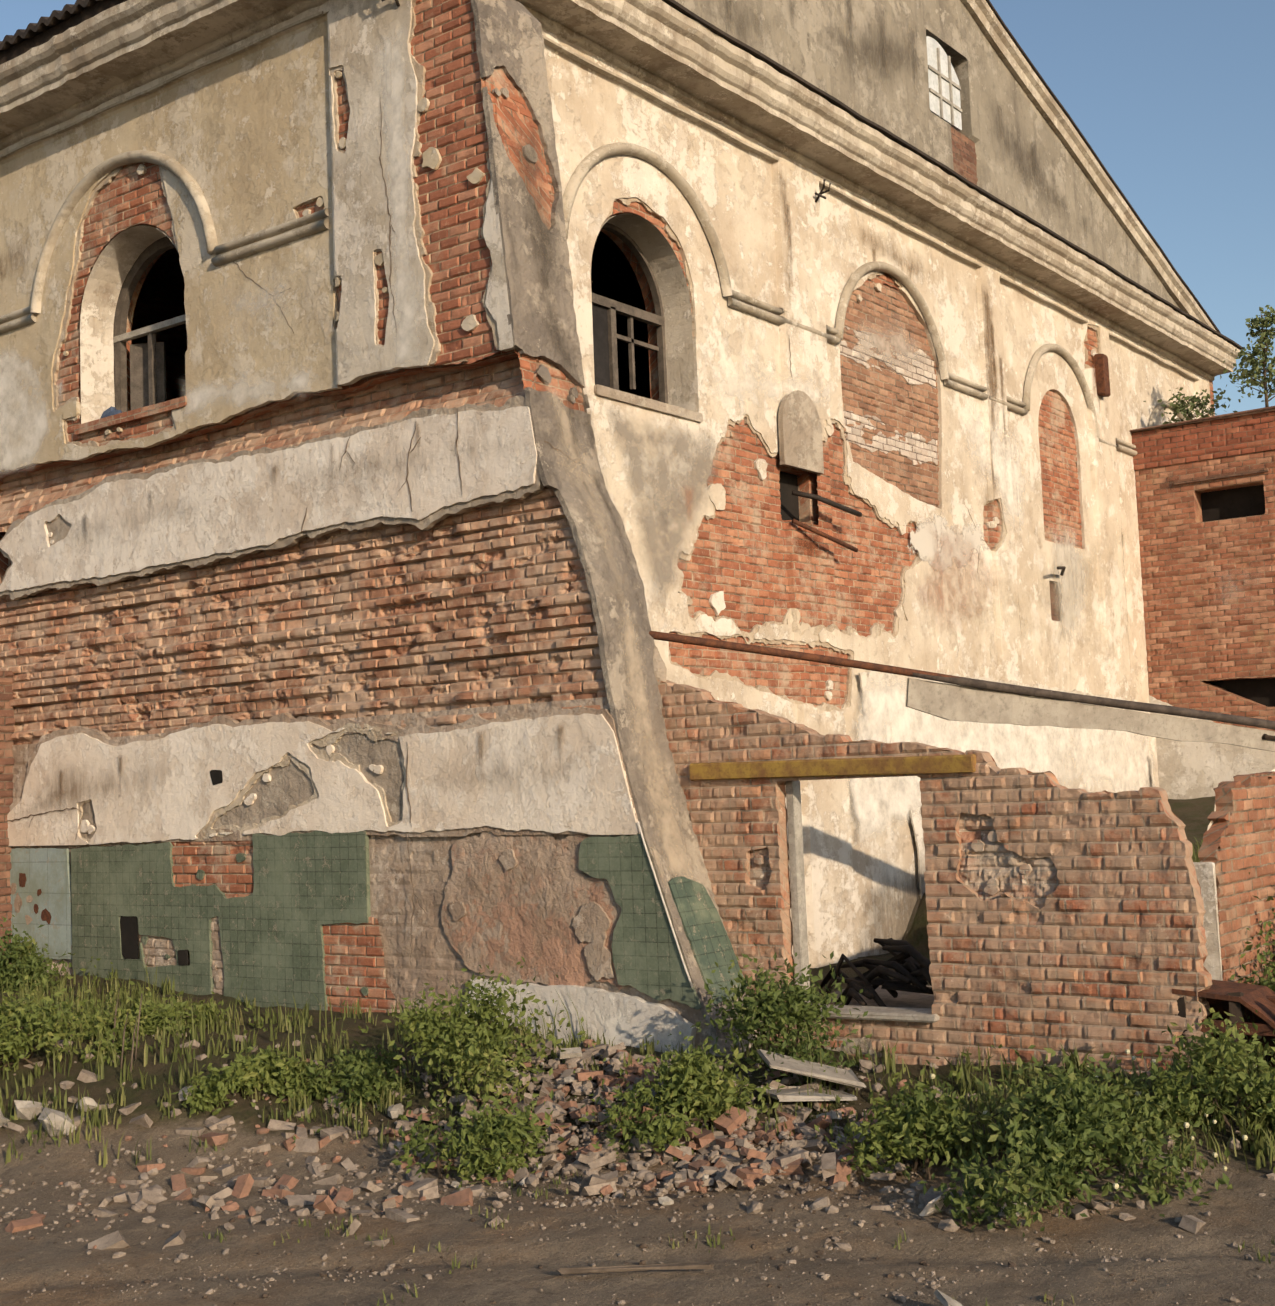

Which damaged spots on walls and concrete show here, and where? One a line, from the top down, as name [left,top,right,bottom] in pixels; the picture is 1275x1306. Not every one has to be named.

spalling [330,66,350,153]
spalling [295,196,325,218]
spalling [374,0,555,366]
spalling [0,162,273,469]
spalling [334,276,342,330]
spalling [0,352,584,600]
crack [399,426,421,510]
crack [455,409,463,490]
spalling [668,375,1153,793]
spalling [9,707,637,995]
peeling [851,776,922,839]
spalling [323,917,403,1014]